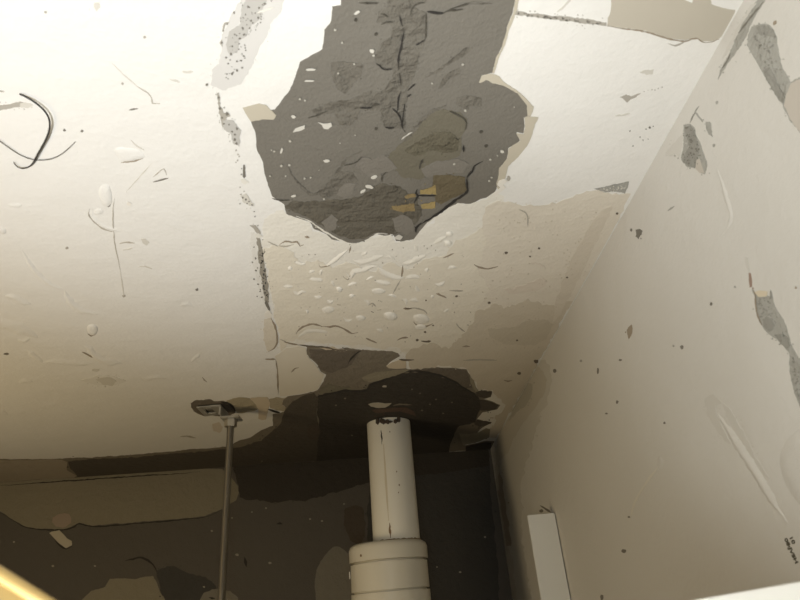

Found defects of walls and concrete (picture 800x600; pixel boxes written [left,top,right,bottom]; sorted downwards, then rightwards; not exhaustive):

spalling [243,0,538,245]
crack [360,2,491,132]
peeling [607,0,735,47]
peeling [677,124,710,175]
peeling [745,22,800,132]
damp [67,105,631,600]
peeling [752,290,800,406]